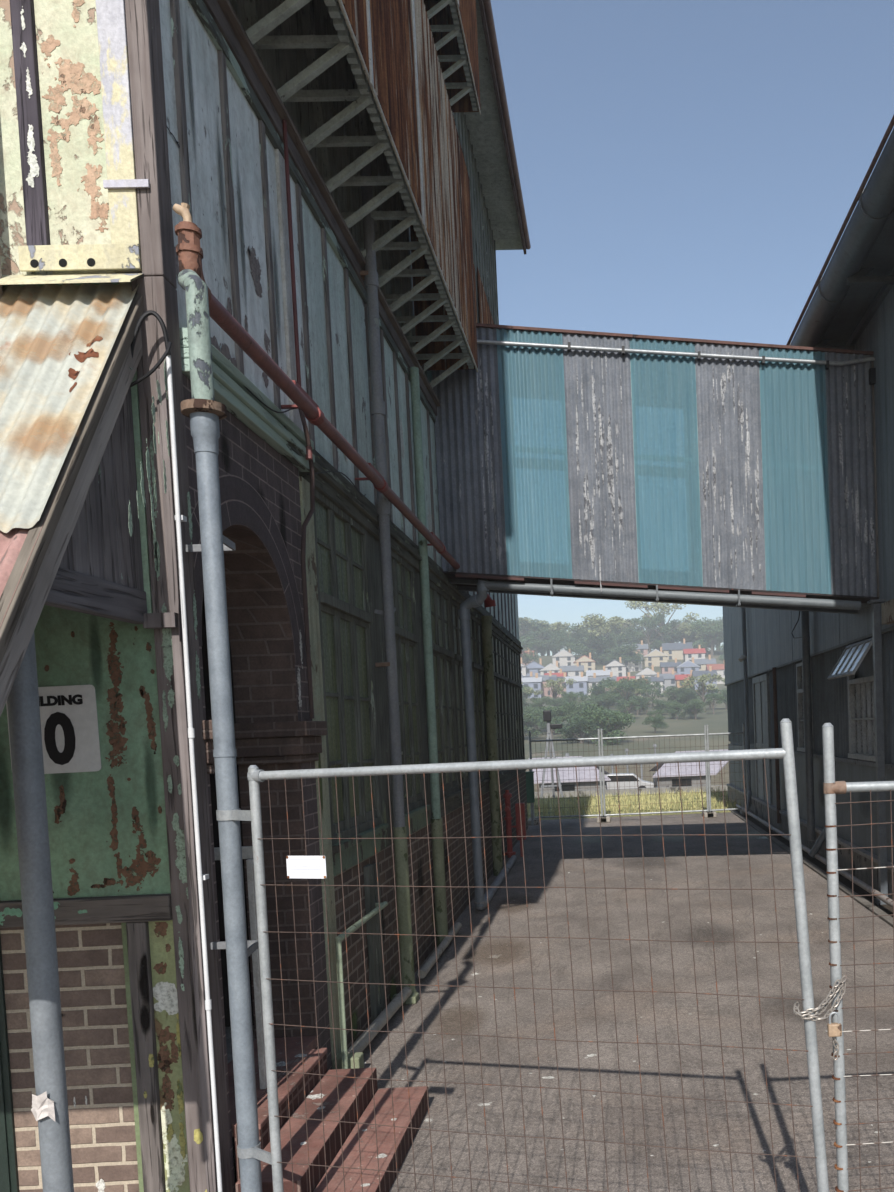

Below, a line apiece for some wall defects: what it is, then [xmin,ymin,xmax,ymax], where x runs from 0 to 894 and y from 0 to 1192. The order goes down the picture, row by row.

peeling [71,0,85,28]
peeling [20,6,109,232]
peeling [248,246,262,298]
corrosion [0,298,33,315]
corrosion [15,296,114,392]
peeling [211,336,237,368]
corrosion [20,421,68,453]
spalling [139,628,175,754]
spalling [53,622,161,919]
peeling [0,907,23,926]
peeling [153,805,188,1192]